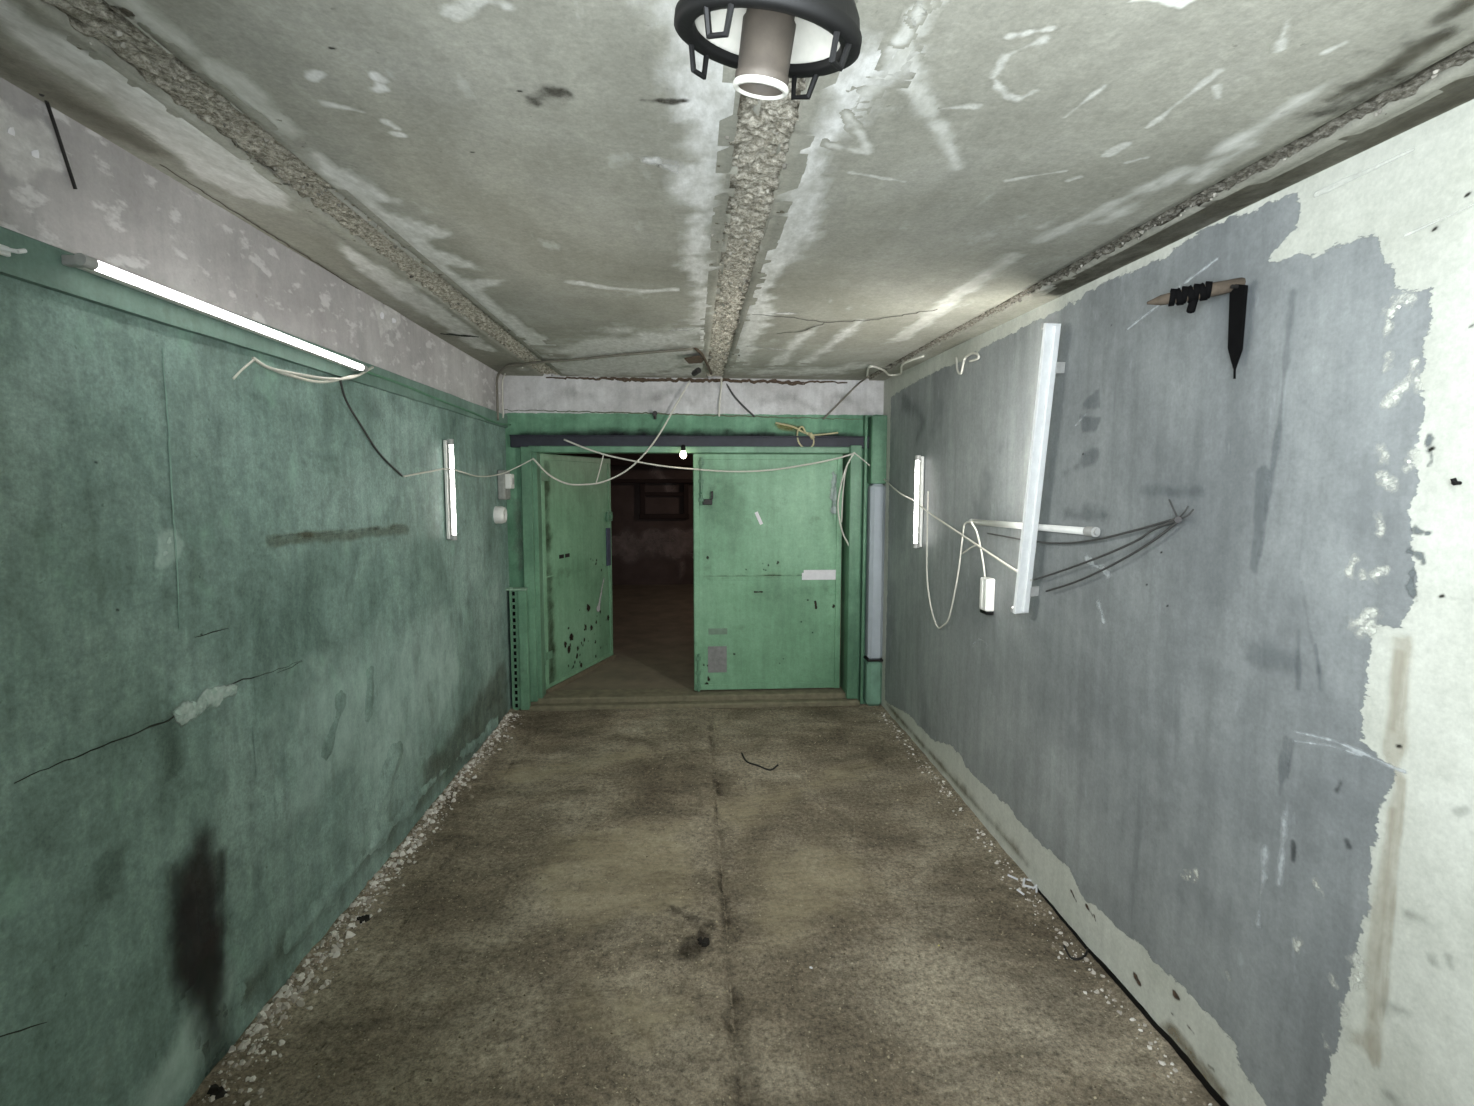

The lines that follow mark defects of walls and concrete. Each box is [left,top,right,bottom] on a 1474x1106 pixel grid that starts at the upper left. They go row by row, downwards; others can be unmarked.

spalling [40,0,559,376]
spalling [704,78,806,378]
peeling [1376,434,1433,490]
peeling [1345,557,1388,580]
peeling [1406,526,1431,597]
peeling [1352,608,1378,636]
crack [227,660,302,686]
flaking render [173,684,237,725]
crack [14,716,177,784]